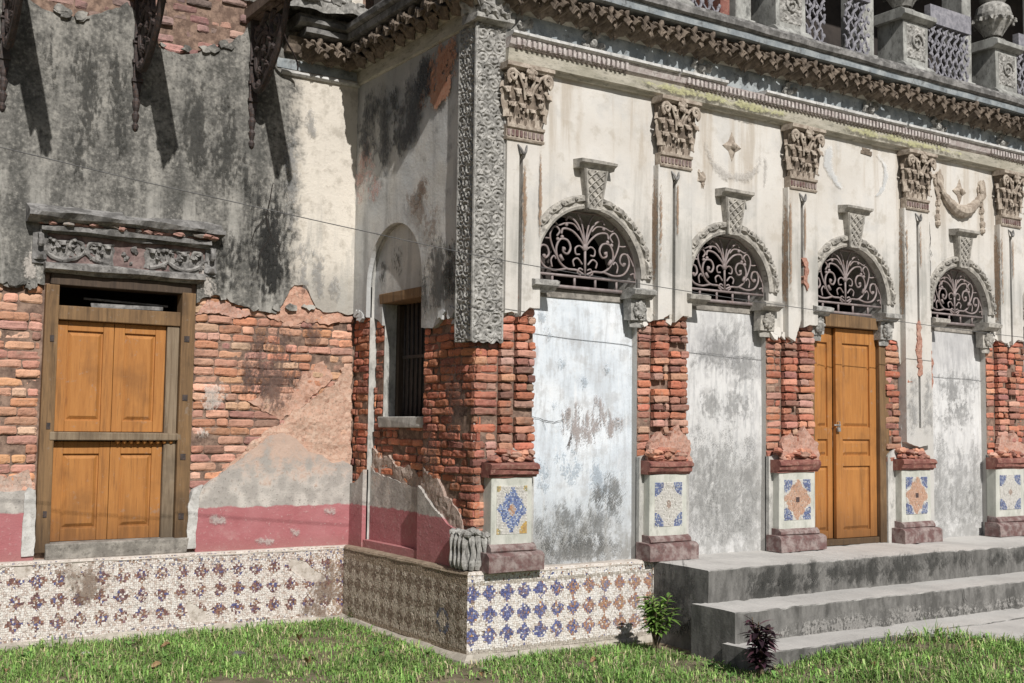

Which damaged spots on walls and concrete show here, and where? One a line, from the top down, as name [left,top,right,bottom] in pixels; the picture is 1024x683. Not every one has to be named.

damp [24,252,36,277]
damp [70,42,128,182]
damp [182,82,293,301]
damp [356,55,431,201]
corrosion [782,204,806,307]
flaking render [0,274,43,492]
flaking render [189,285,536,531]
flaking render [637,313,693,462]
flaking render [765,326,820,460]
flaking render [885,321,934,461]
flaking render [985,335,1024,459]
damp [536,475,622,564]